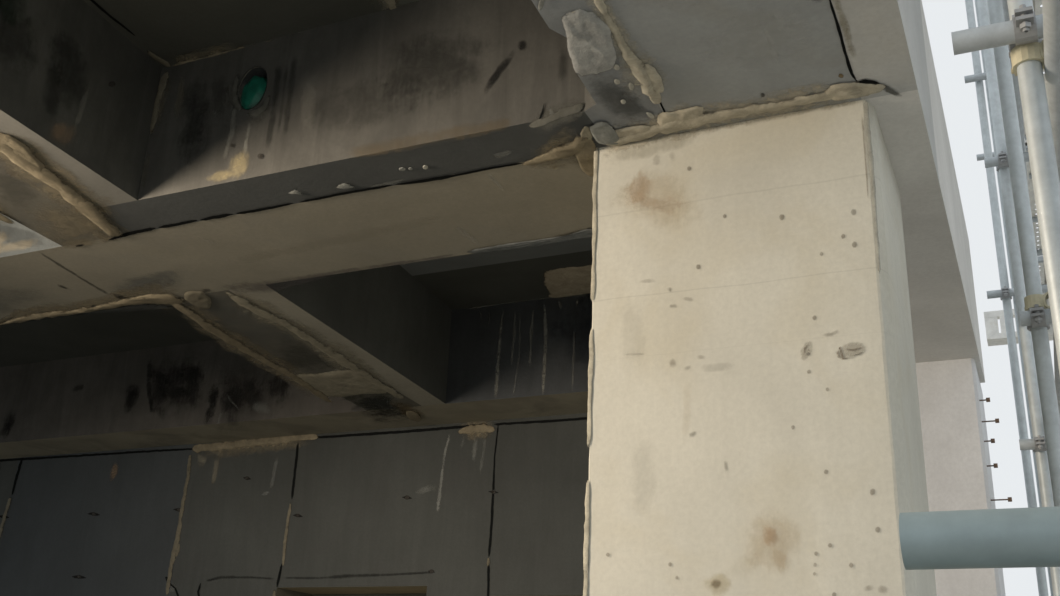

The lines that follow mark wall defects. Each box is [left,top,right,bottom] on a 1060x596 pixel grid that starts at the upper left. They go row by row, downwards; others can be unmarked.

damp [488,60,508,87]
crack [829,0,898,96]